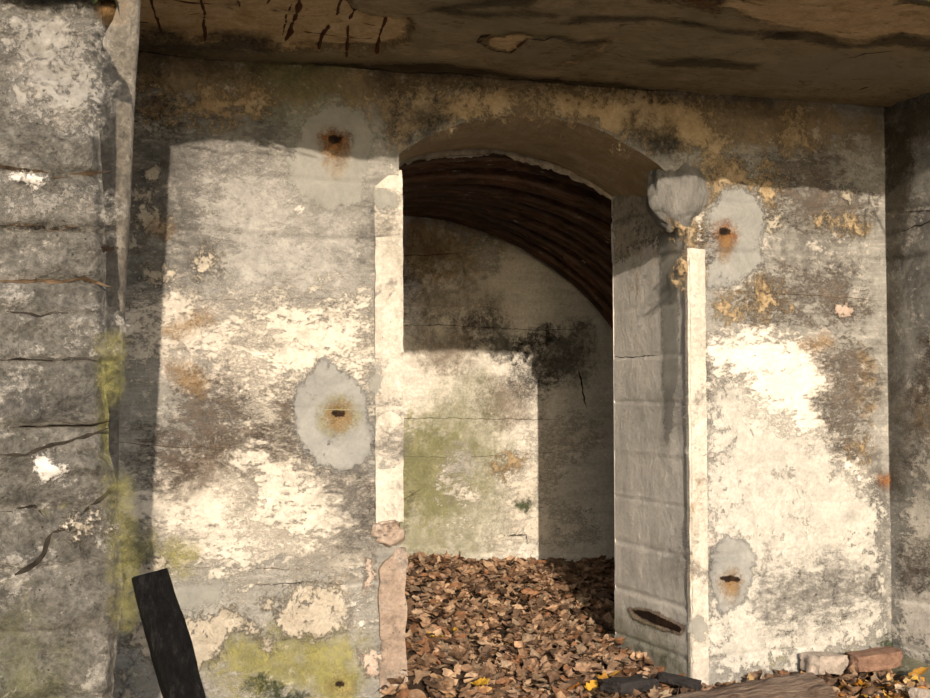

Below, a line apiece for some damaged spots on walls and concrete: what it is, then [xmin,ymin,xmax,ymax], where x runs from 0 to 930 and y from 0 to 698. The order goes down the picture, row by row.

spalling [139,0,418,58]
leakage [136,27,652,91]
spalling [568,0,930,51]
corrosion [318,129,350,166]
leakage [127,111,284,291]
corrosion [713,221,737,255]
leakage [884,93,930,498]
peeling [381,75,930,684]
crack [0,421,240,457]
peeling [114,141,412,698]
crack [0,485,115,576]
corrosion [720,575,740,593]